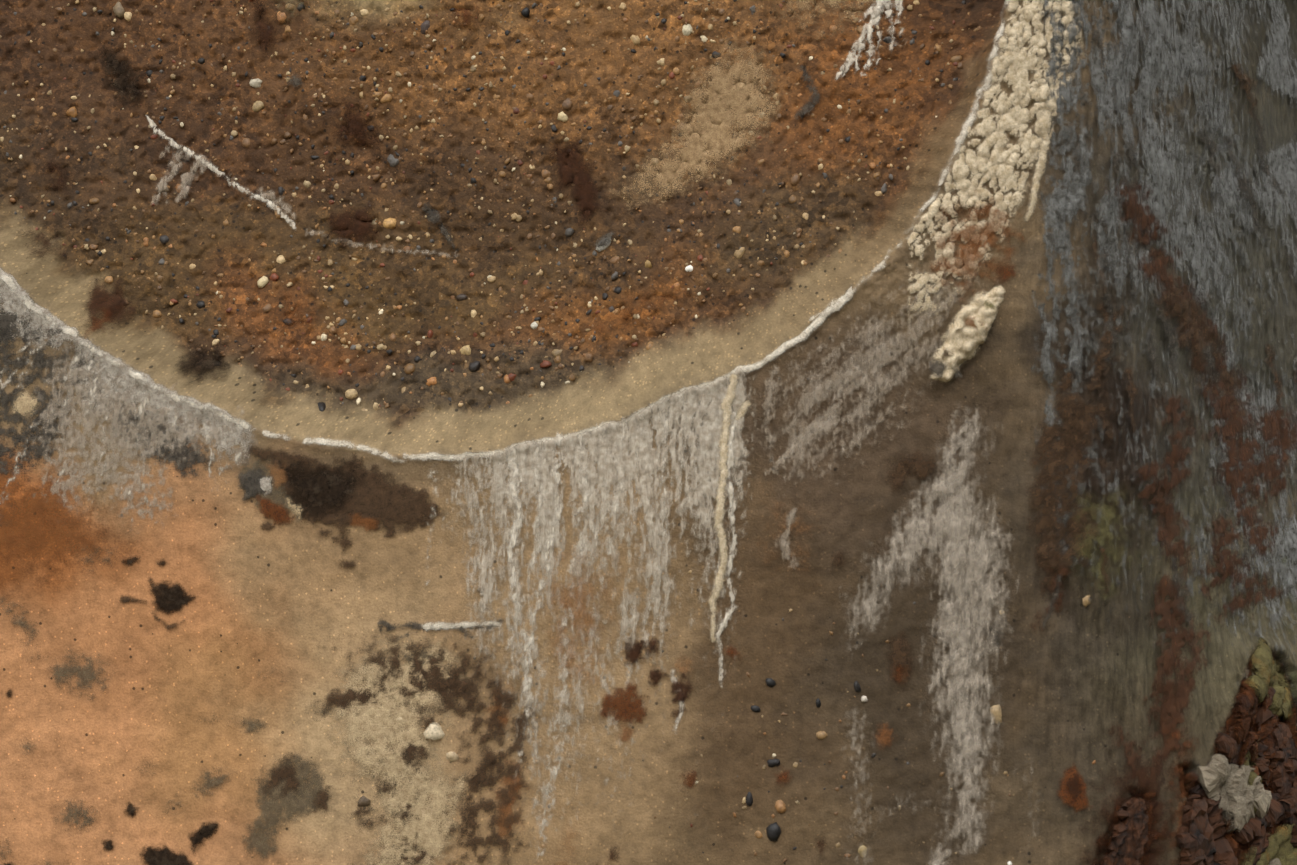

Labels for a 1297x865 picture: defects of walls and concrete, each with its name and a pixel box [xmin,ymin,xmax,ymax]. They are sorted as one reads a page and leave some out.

crack [146,115,458,255]
crack [794,64,820,119]
crack [1198,64,1293,277]
water stain [765,0,1297,655]
crack [1093,209,1225,432]
crack [1265,346,1297,415]
water stain [0,268,856,855]
water stain [858,420,1005,865]
spalling [1058,637,1297,865]